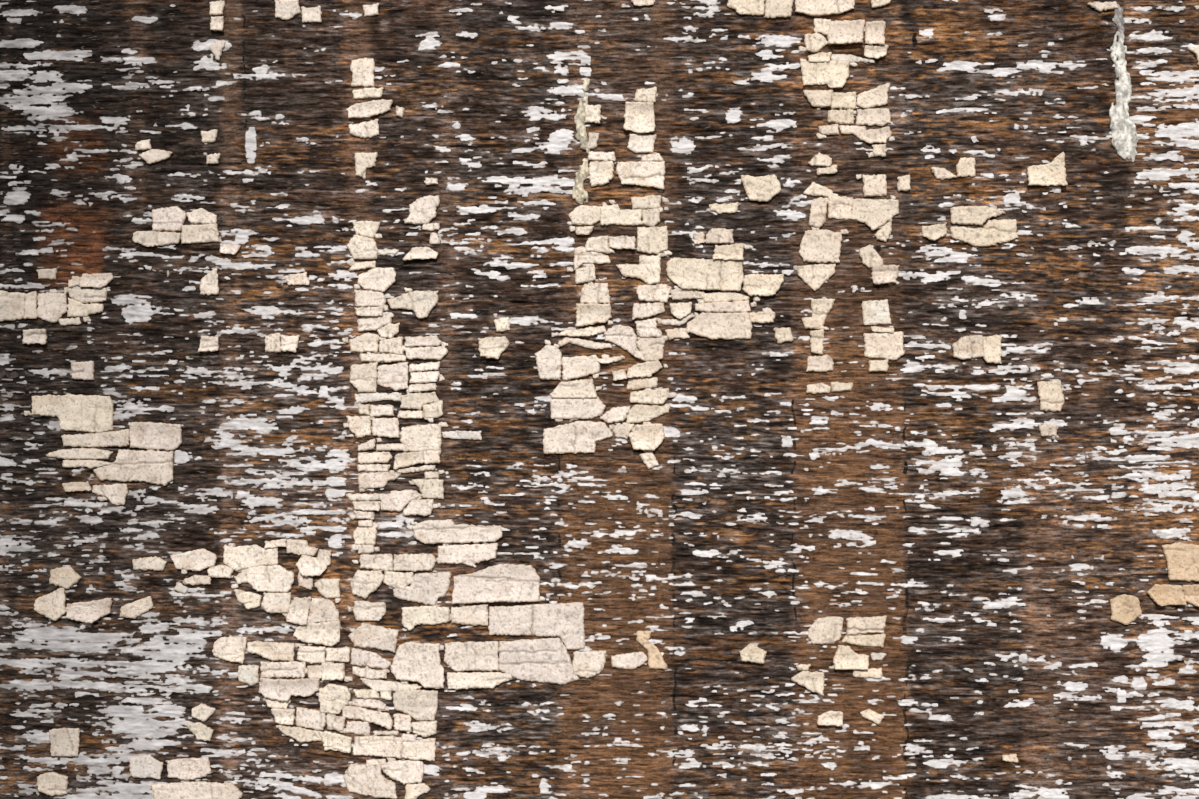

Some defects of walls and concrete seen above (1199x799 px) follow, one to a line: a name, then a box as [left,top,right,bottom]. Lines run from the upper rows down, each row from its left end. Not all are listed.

peeling [325,32,475,139]
peeling [341,152,407,198]
peeling [424,135,468,191]
peeling [1059,1,1199,285]
peeling [762,351,794,361]
peeling [463,721,514,733]
peeling [522,694,569,720]
peeling [444,782,512,799]